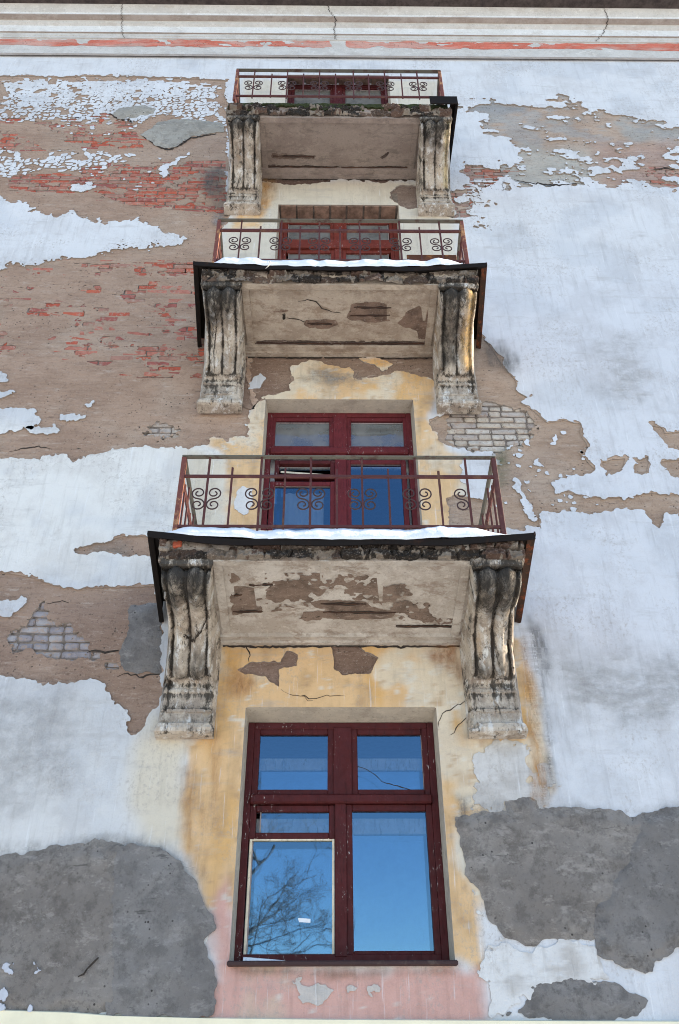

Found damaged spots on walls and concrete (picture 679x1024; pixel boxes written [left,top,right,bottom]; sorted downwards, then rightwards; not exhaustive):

peeling [0,74,679,462]
crack [273,299,340,322]
peeling [74,335,679,625]
peeling [0,571,164,735]
peeling [238,651,298,686]
peeling [331,646,378,675]
peeling [477,937,609,1018]